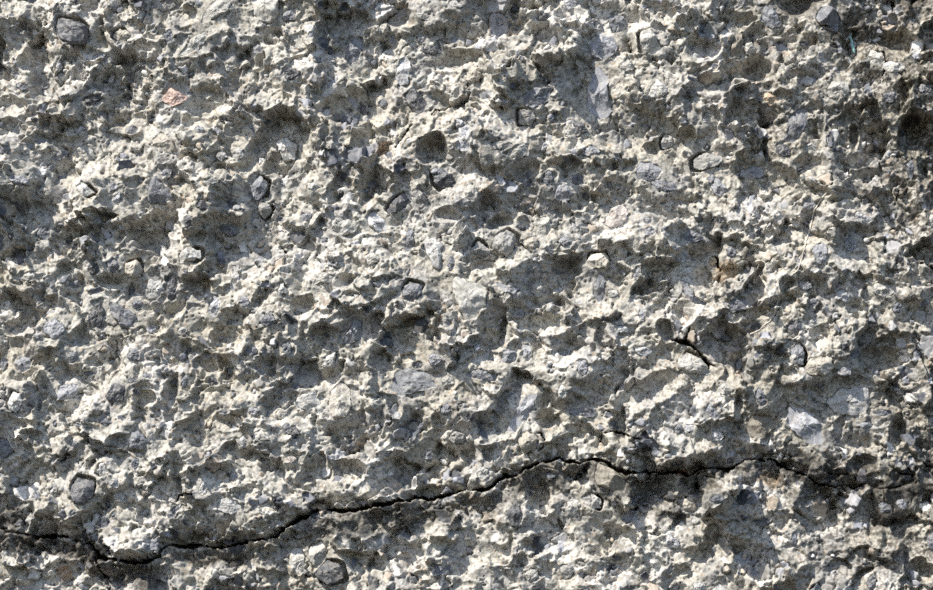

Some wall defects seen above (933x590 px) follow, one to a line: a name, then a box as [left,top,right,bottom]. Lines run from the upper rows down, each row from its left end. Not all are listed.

crack [672,326,715,367]
crack [0,430,932,590]